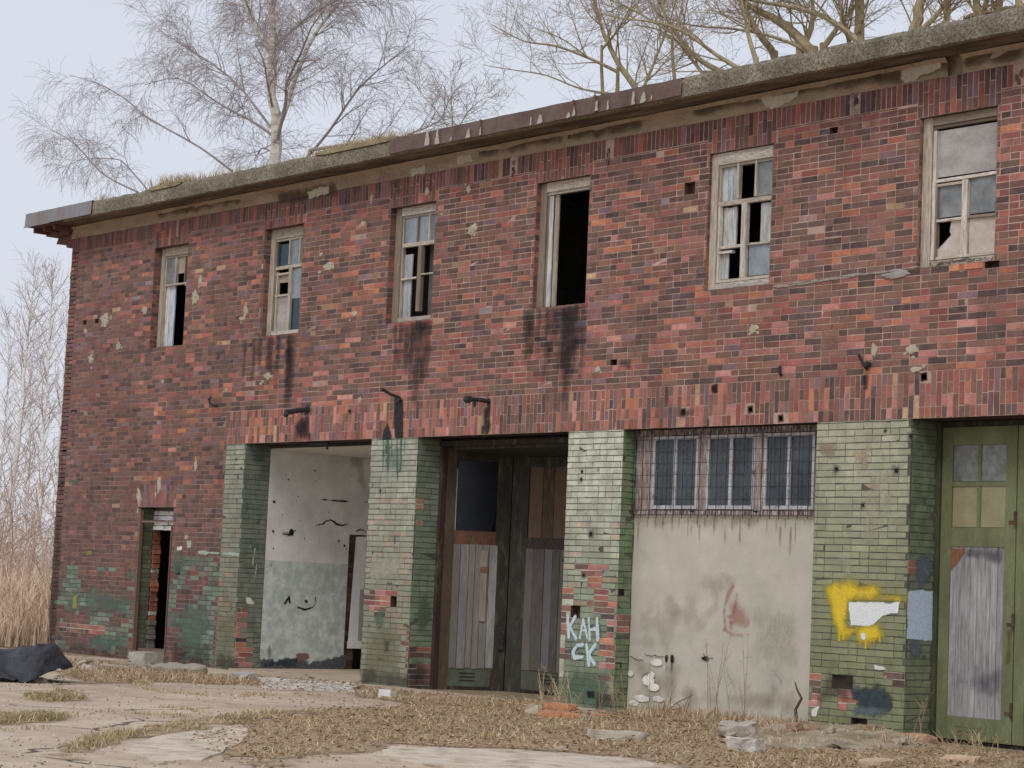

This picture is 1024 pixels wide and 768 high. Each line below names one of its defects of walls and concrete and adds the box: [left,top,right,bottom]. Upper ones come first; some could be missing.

peeling [901,63,941,82]
water stain [546,307,578,368]
water stain [297,420,309,437]
spalling [559,559,679,709]